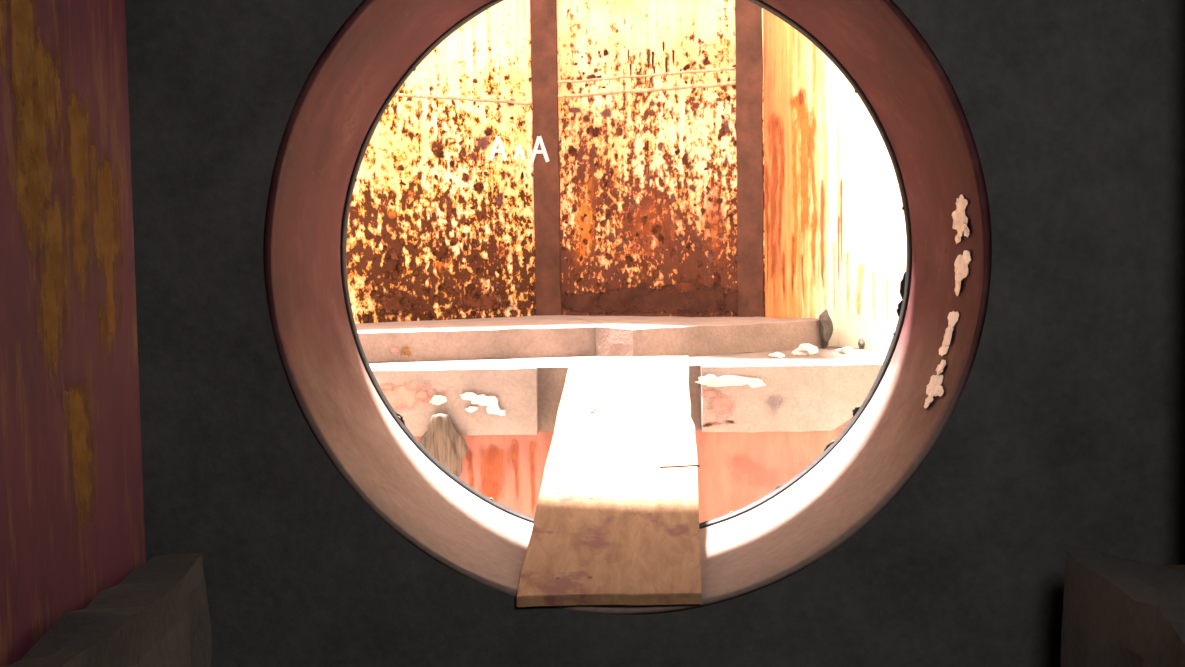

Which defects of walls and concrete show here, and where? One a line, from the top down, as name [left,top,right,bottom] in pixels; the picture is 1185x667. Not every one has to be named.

corrosion [362,105,534,323]
corrosion [562,41,738,317]
corrosion [765,91,842,298]
peeling [952,194,971,296]
peeling [380,384,447,411]
peeling [460,392,506,416]
spalling [696,374,766,414]
peeling [924,311,959,409]